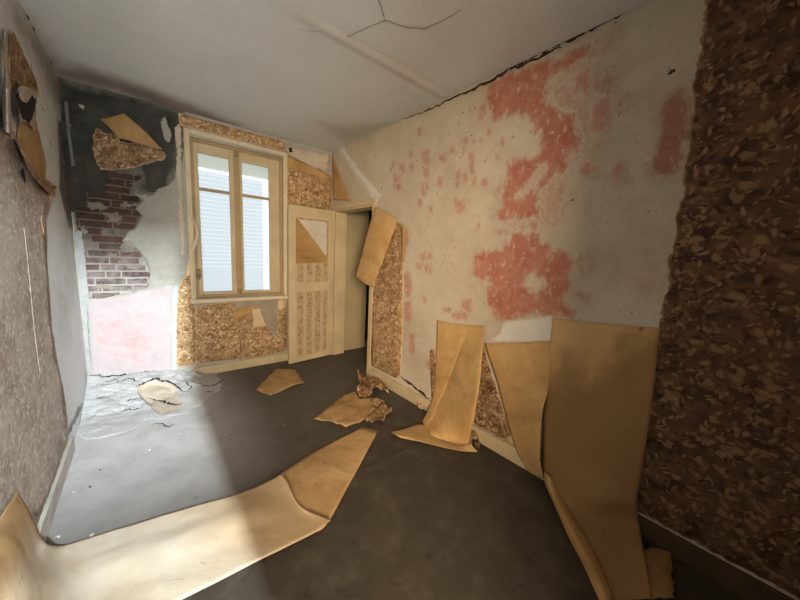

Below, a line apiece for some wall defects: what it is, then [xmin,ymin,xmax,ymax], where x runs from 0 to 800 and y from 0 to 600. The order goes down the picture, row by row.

crack [346,0,462,37]
crack [403,14,623,119]
spalling [160,117,185,255]
flaking render [286,146,351,201]
peeling [299,219,327,255]
spalling [74,169,152,374]
peeling [235,299,278,337]
crack [94,371,224,412]